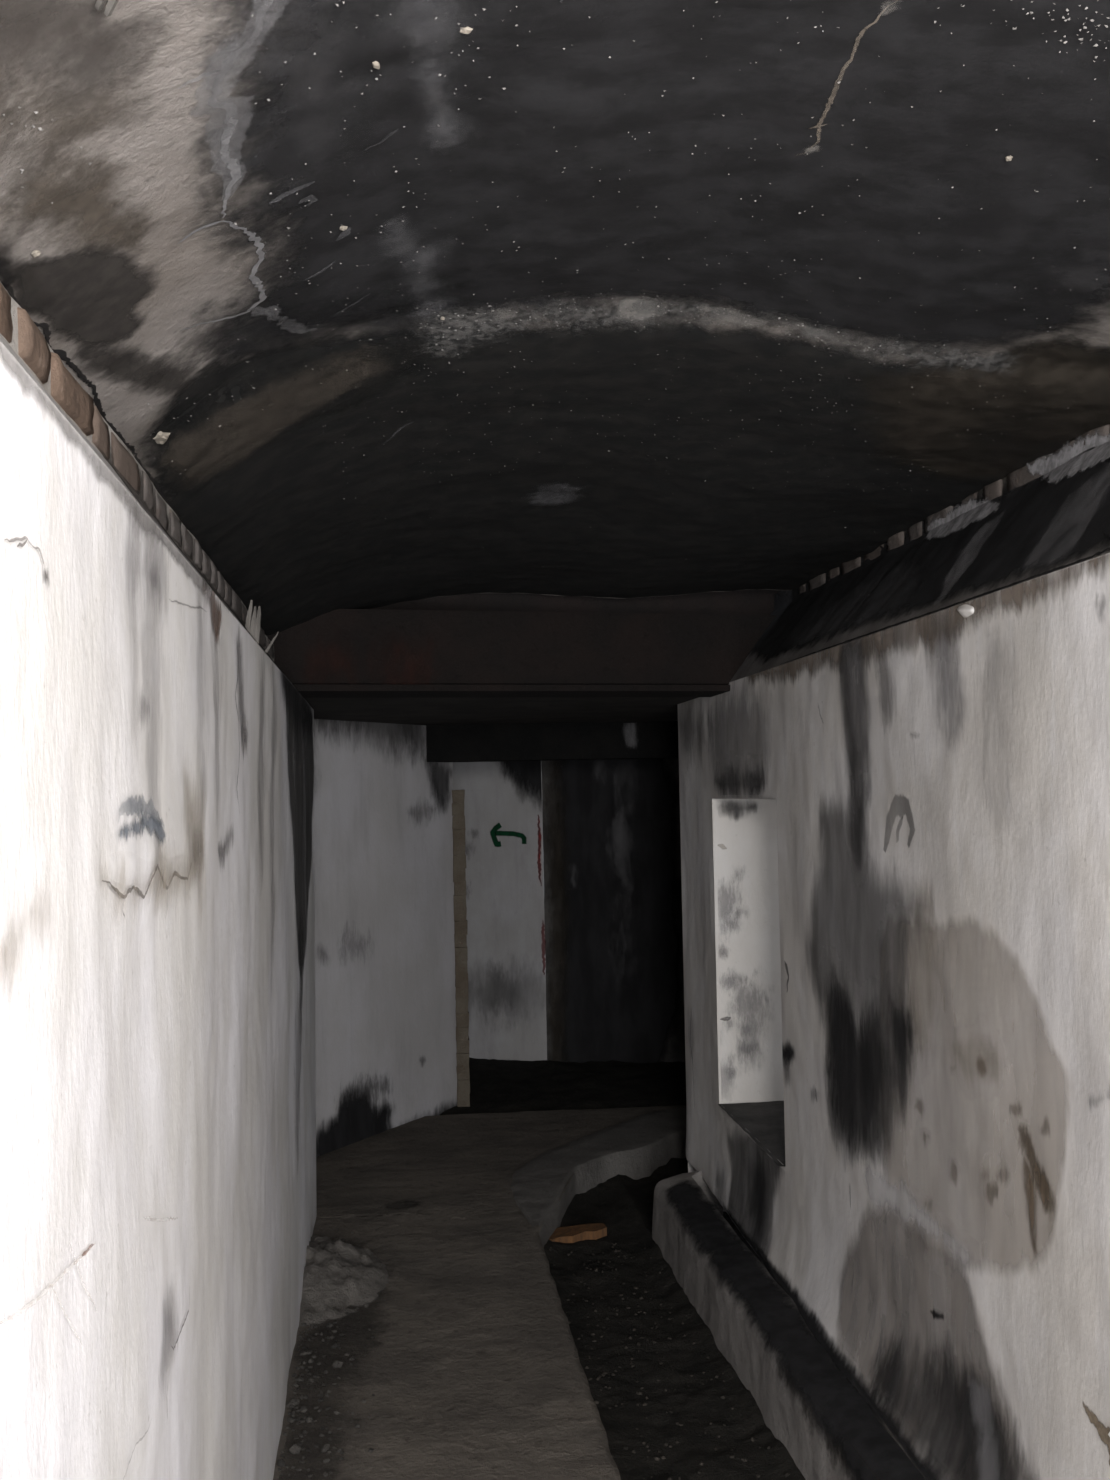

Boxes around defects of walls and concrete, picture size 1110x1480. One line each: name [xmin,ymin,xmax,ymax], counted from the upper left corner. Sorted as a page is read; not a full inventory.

crack [0,259,179,518]
damp [0,0,192,395]
damp [166,48,451,484]
damp [412,0,456,146]
damp [281,672,313,736]
crack [102,852,194,916]
damp [300,925,324,1017]
damp [840,1206,1021,1480]